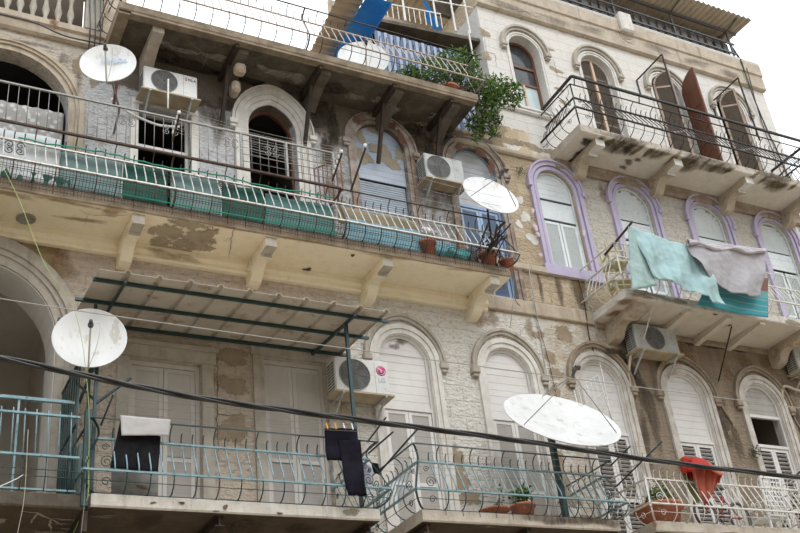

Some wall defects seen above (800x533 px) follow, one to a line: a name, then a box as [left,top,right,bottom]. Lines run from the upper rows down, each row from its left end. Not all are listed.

peeling [353,111,406,170]
damp [526,132,734,215]
damp [750,171,797,191]
peeling [147,220,219,252]
crack [23,511,62,531]